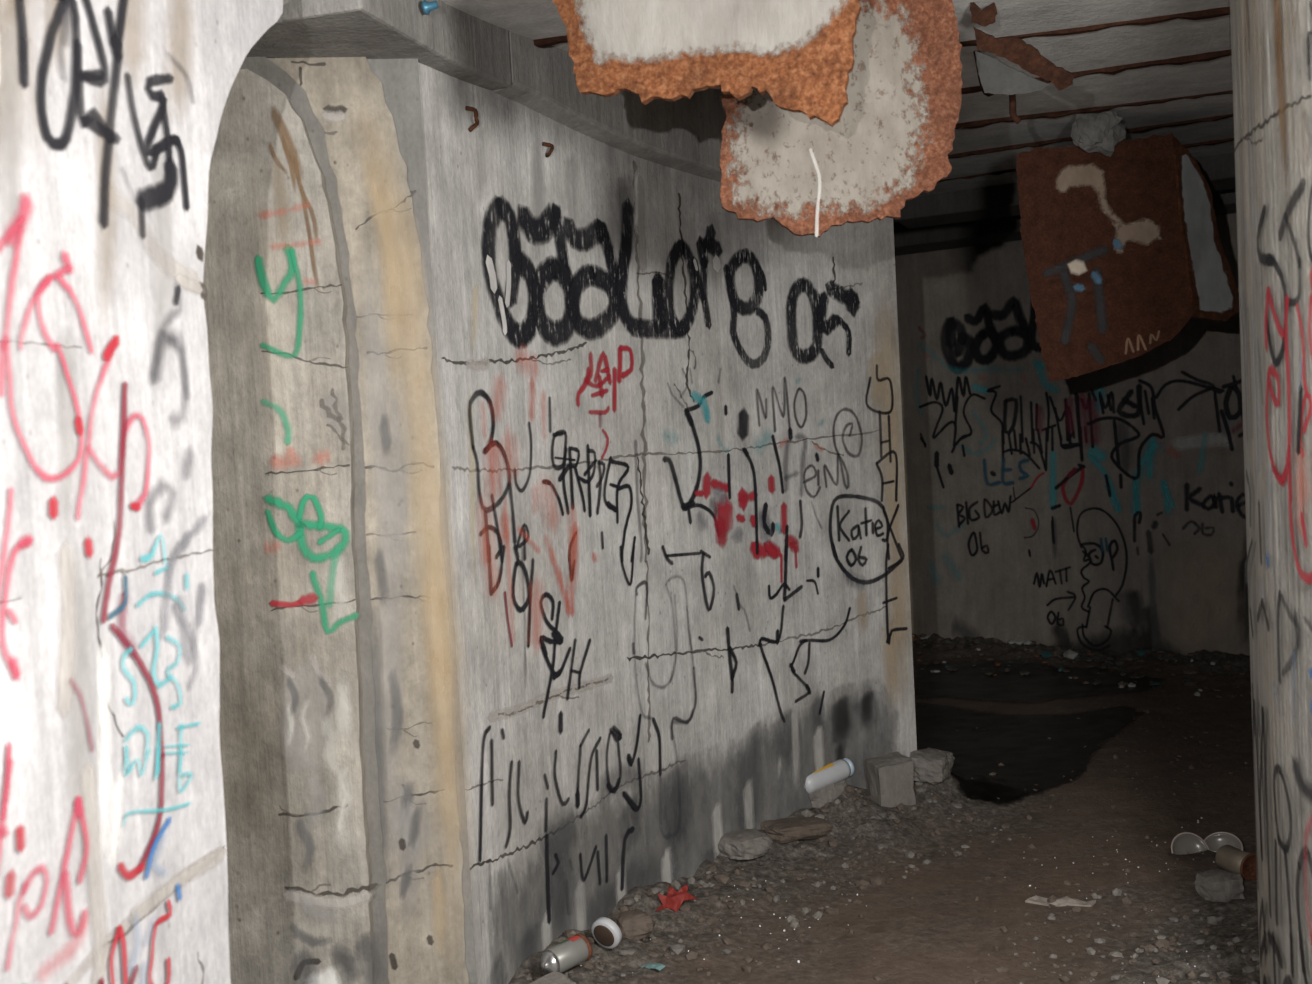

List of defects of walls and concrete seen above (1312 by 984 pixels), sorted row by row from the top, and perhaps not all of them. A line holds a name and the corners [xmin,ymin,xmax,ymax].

rust [997,0,1248,39]
rust [533,35,568,48]
rust [1071,48,1232,78]
rust [961,86,981,94]
rust [955,90,1233,129]
rust [948,137,1073,158]
crack [40,341,82,349]
crack [260,161,886,908]
crack [96,529,214,664]
crack [100,699,124,737]
leakage [496,692,893,973]
crack [82,845,225,971]